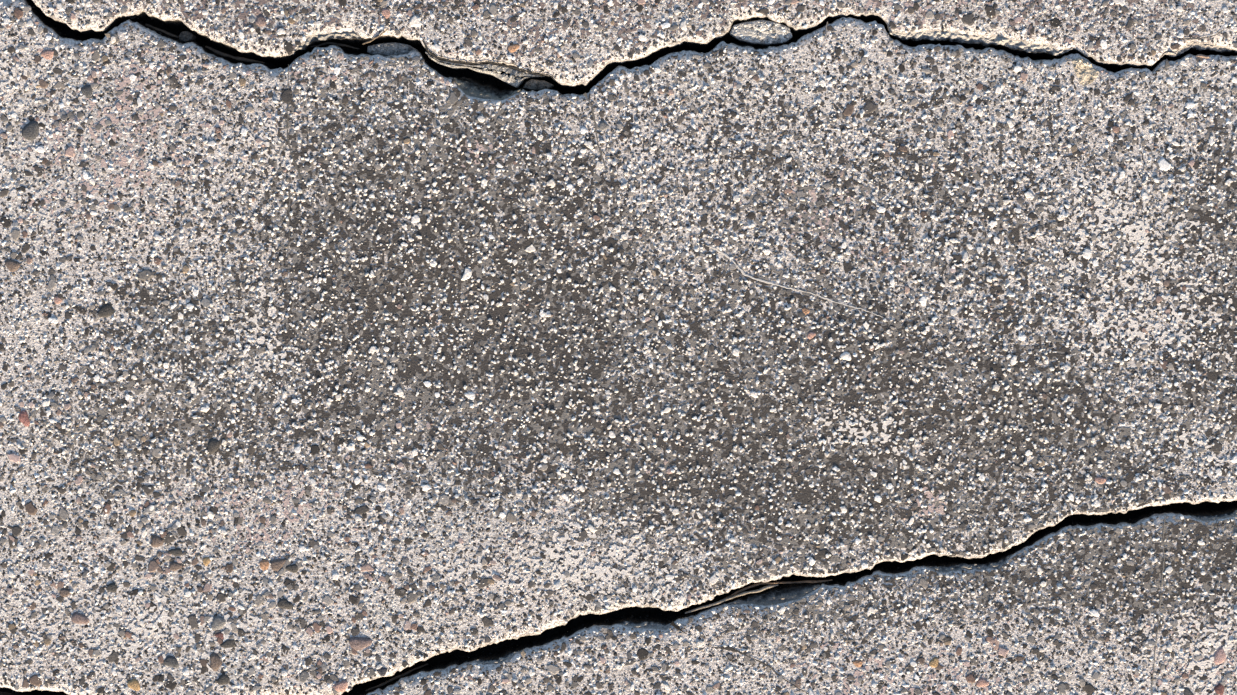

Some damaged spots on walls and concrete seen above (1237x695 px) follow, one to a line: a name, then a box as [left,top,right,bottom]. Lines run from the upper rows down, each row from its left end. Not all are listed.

crack [26,0,1237,258]
crack [0,687,69,695]
crack [341,500,1237,695]